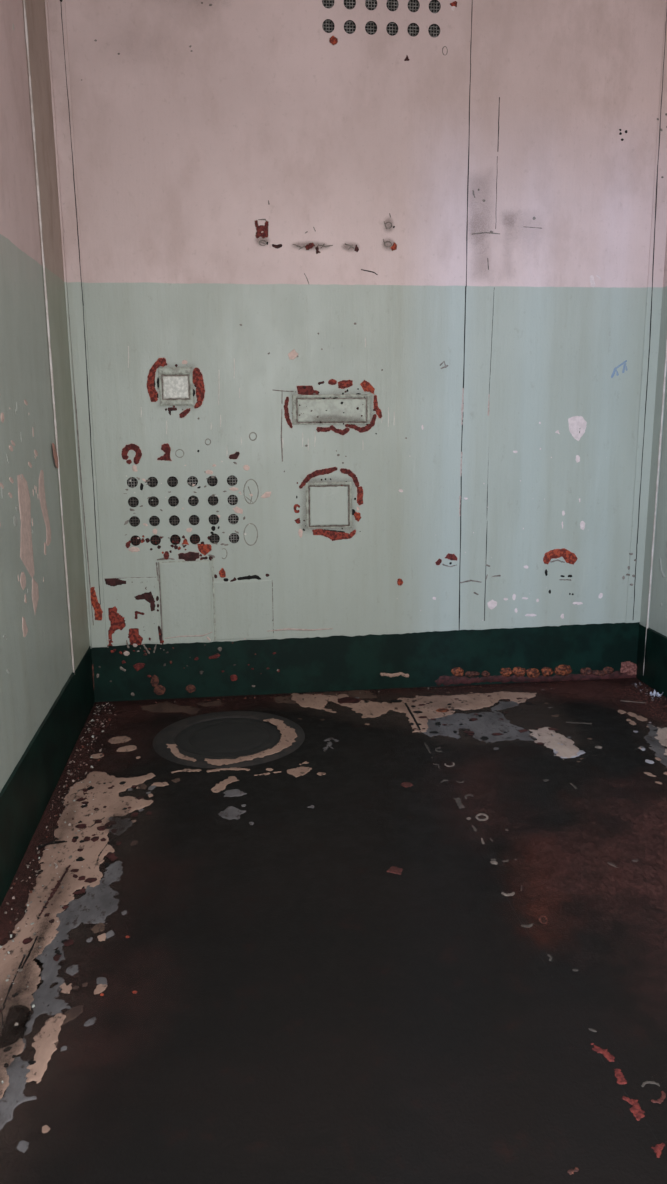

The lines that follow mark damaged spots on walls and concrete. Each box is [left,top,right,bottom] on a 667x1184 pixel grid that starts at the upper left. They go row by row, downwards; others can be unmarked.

peeling [0,429,59,637]
peeling [618,700,667,784]
peeling [0,661,637,1131]
corrosion [591,1043,645,1121]
peeling [17,1140,29,1153]
corrosion [651,1143,665,1158]